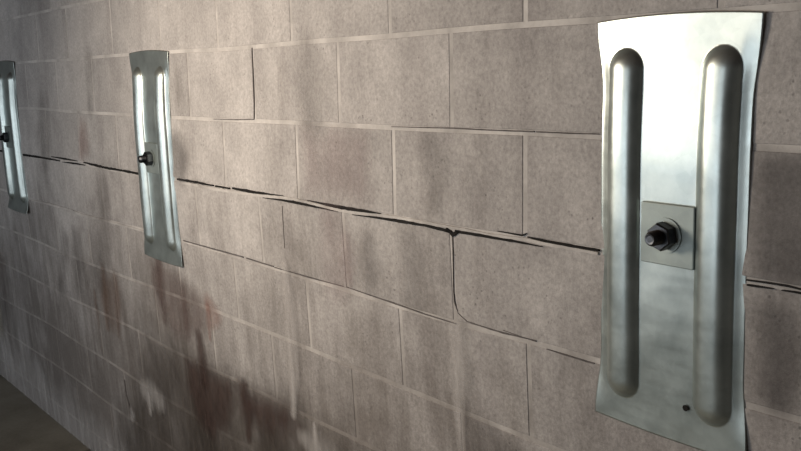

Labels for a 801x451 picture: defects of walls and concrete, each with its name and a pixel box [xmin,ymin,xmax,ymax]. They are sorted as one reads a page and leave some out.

crack [23,154,138,175]
crack [177,178,600,364]
crack [745,279,801,294]